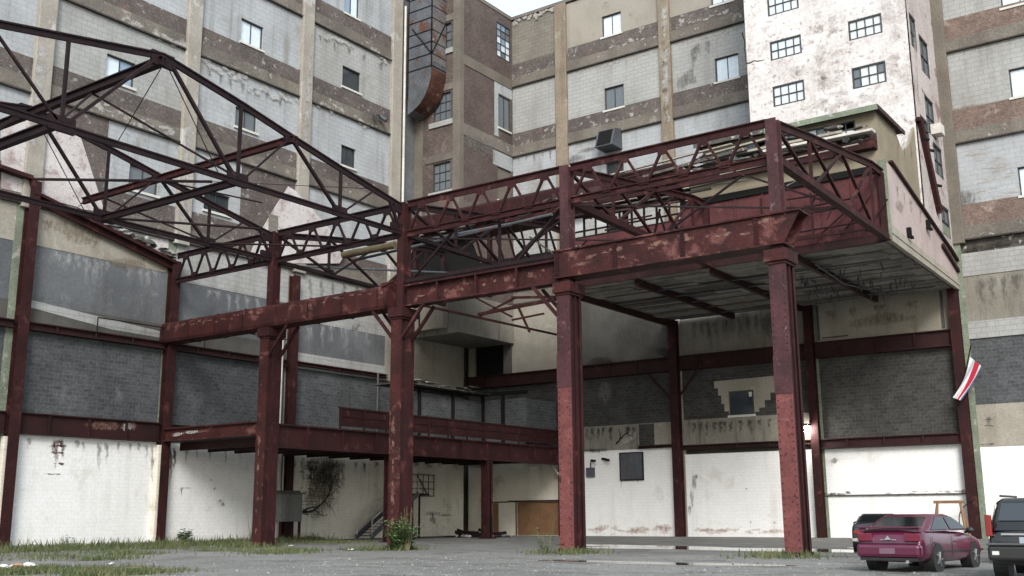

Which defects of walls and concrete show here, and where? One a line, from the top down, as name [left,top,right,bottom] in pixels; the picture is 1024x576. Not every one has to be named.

peeling [201,49,378,162]